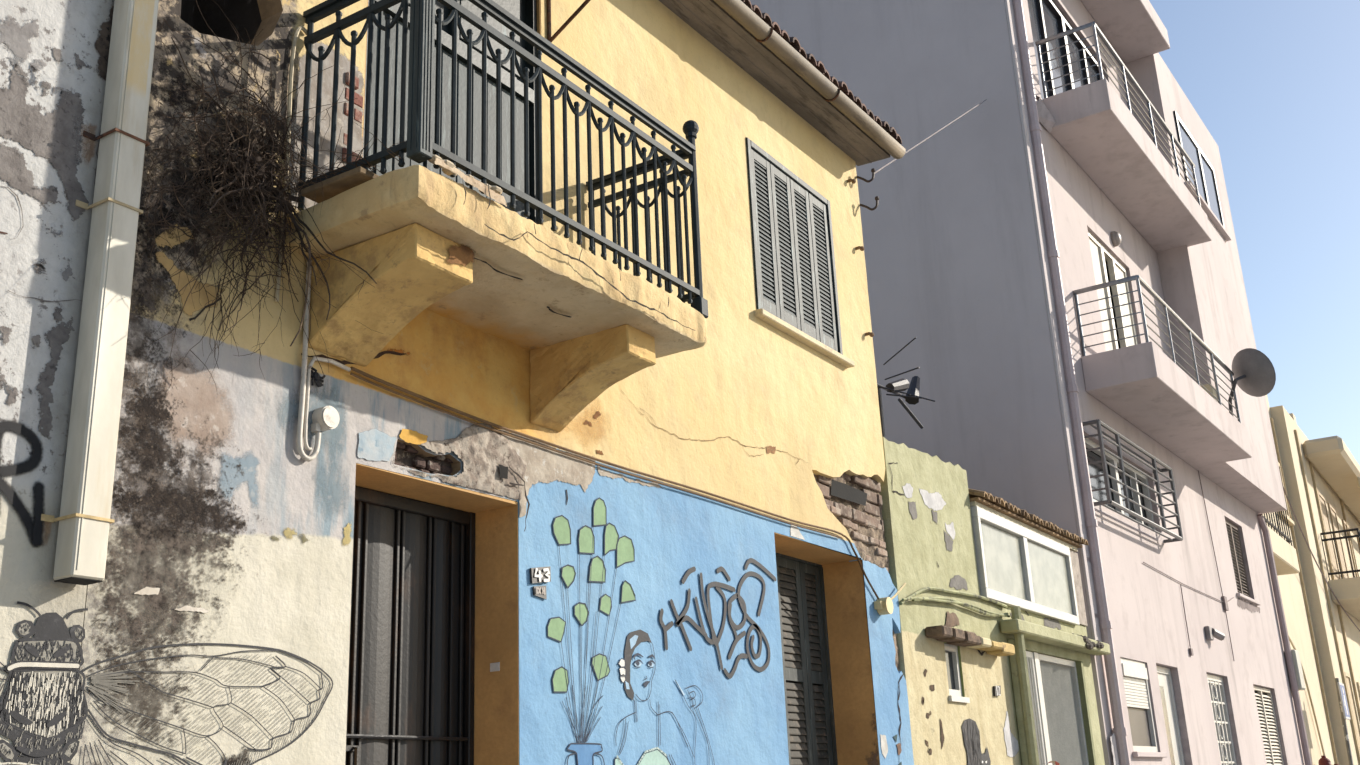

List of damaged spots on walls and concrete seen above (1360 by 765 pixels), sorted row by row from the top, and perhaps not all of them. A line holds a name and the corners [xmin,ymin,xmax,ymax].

flaking render [0,15,92,280]
crack [462,179,696,331]
flaking render [0,304,74,441]
water stain [87,65,259,758]
spalling [280,390,661,517]
crack [621,390,808,464]
spalling [813,473,890,573]
peeling [903,483,955,552]
water stain [222,746,250,765]